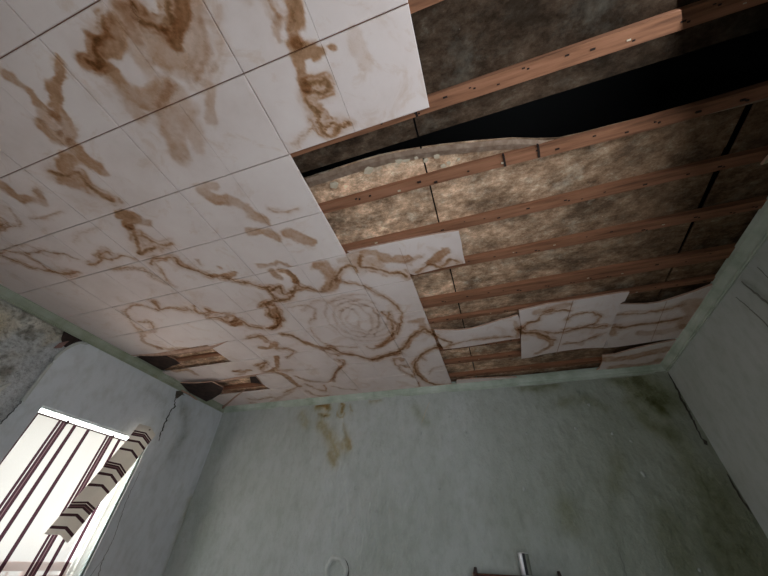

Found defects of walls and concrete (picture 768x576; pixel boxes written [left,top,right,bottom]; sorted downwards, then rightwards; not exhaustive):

water stain [86,26,106,69]
water stain [301,78,350,136]
water stain [258,274,298,337]
crack [736,267,768,327]
water stain [329,329,443,385]
crack [159,391,183,440]
crack [668,373,708,445]
crack [727,474,752,514]